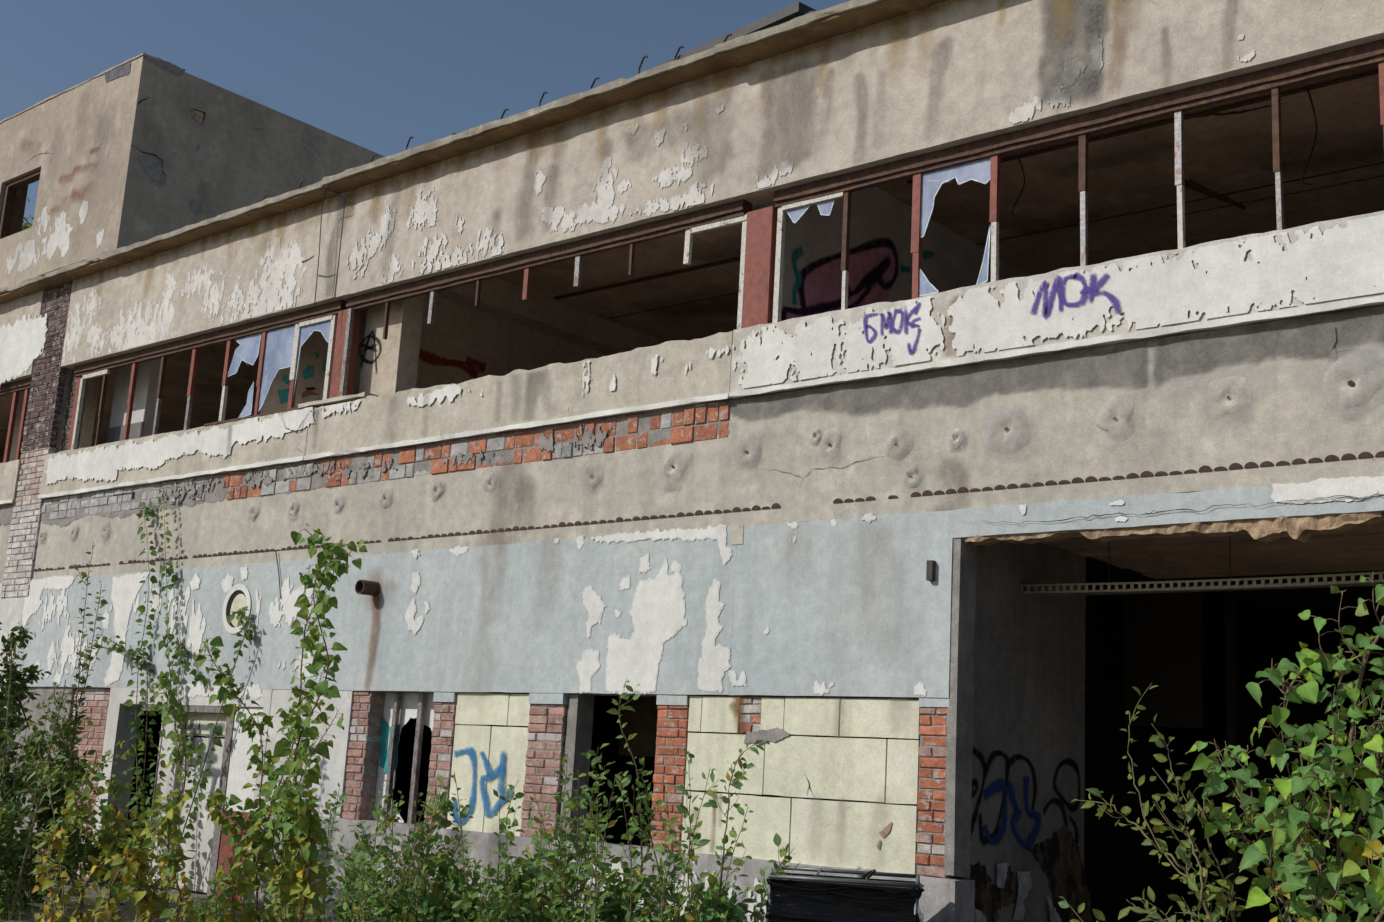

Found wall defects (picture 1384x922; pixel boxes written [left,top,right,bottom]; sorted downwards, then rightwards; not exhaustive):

leakage [1039,0,1106,100]
peeling [7,200,88,274]
peeling [347,186,507,284]
peeling [0,313,47,384]
peeling [41,214,1384,528]
spalling [962,476,1384,546]
peeling [22,571,213,687]
peeling [177,682,265,701]
peeling [221,566,316,628]
peeling [273,651,316,682]
corrosion [368,595,378,667]
peeling [554,524,762,733]